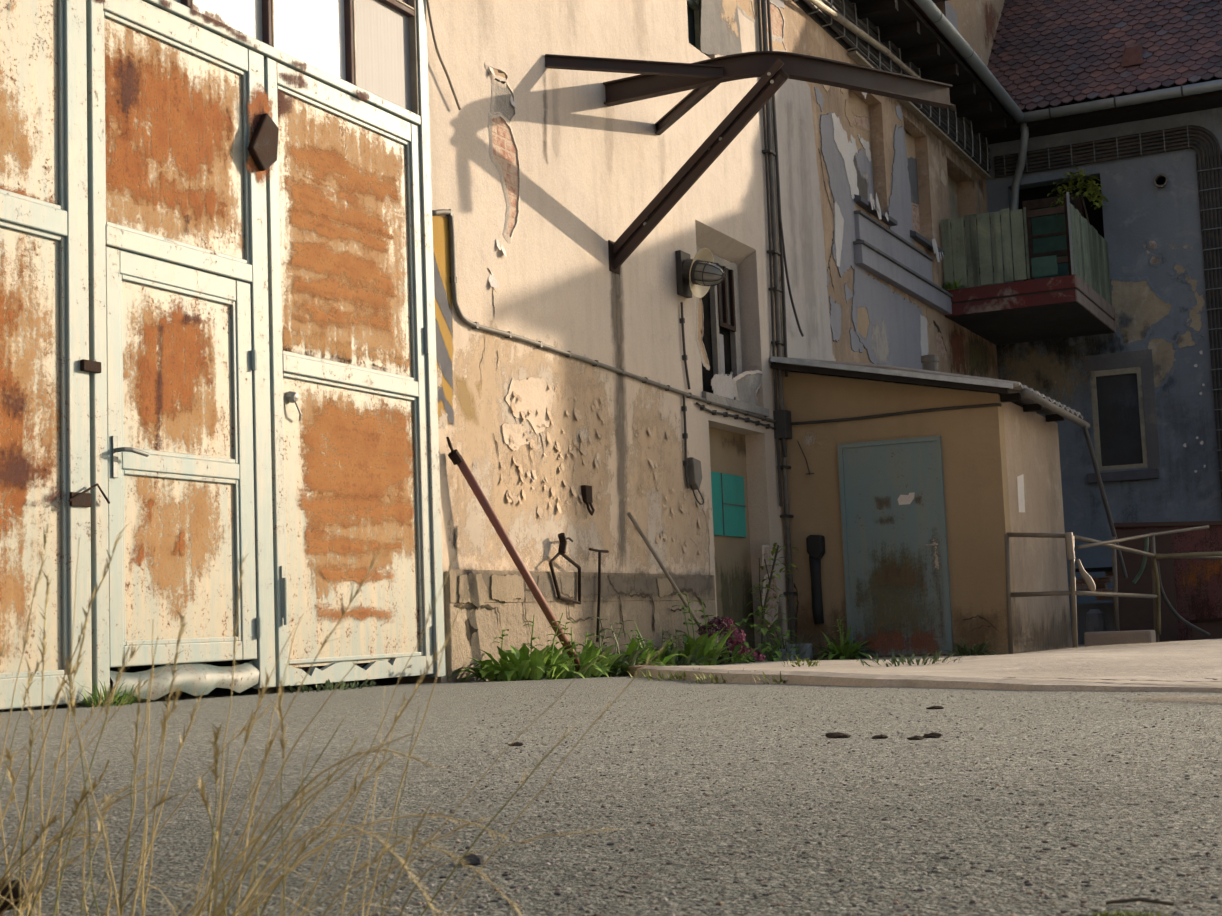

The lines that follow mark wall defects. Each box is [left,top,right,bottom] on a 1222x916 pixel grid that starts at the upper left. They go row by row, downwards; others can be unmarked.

corrosion [0,70,59,205]
corrosion [0,238,62,657]
corrosion [123,298,222,453]
corrosion [105,26,410,372]
corrosion [299,389,416,622]
spalling [484,61,521,257]
peeling [437,324,717,613]
peeling [814,84,944,369]
peeling [1110,260,1207,395]